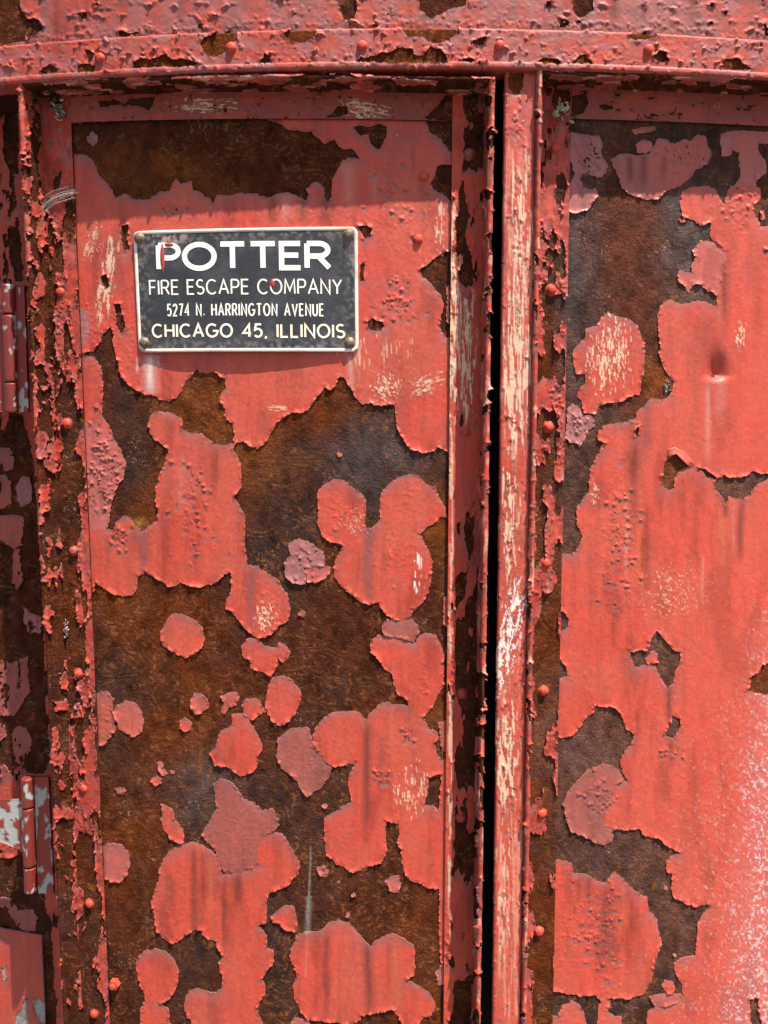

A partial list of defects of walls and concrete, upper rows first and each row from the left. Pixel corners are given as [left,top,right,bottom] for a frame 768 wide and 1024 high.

rust [0,413,51,786]
rust [72,119,359,202]
peeling [0,26,493,1024]
rust [84,327,449,1024]
peeling [519,408,569,1024]
peeling [529,228,567,388]
rust [553,706,709,1024]
peeling [535,51,768,206]
rust [630,631,680,711]
rust [562,93,768,554]
peeling [665,716,680,738]
peeling [661,454,716,490]